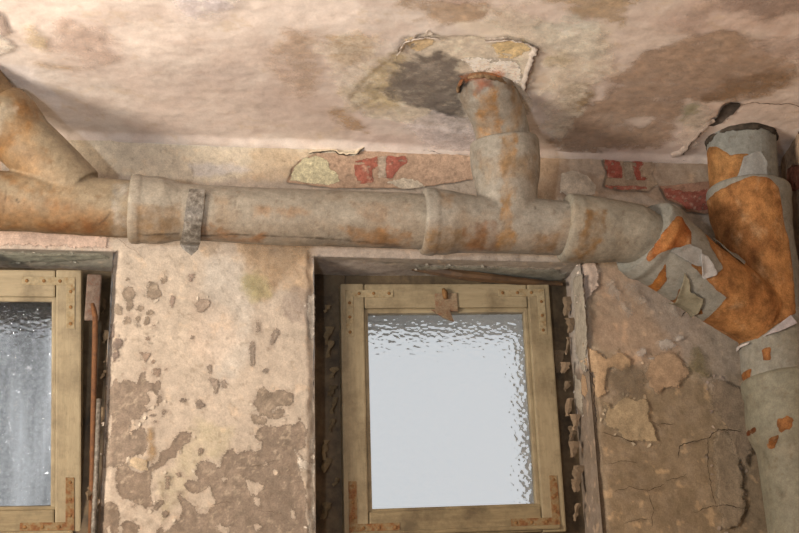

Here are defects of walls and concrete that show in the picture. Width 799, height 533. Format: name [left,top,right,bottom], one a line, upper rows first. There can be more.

water stain [273,31,476,151]
flaking render [287,150,473,190]
water stain [401,0,799,153]
crack [671,119,716,158]
peeling [97,274,316,533]
peeling [415,263,690,448]
crack [587,369,636,464]
crack [678,429,742,512]